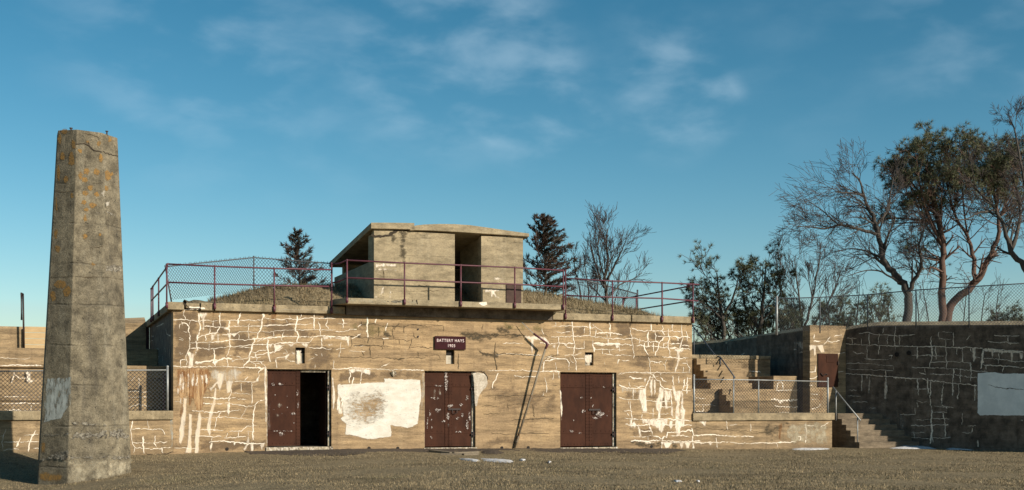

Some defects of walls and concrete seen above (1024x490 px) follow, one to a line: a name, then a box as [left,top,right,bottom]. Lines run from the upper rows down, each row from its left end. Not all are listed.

damp [265,322,349,368]
damp [579,323,631,363]
damp [651,333,689,371]
damp [972,343,1023,362]
corrosion [175,368,210,411]
damp [170,311,266,453]
damp [339,369,420,381]
damp [622,356,712,448]